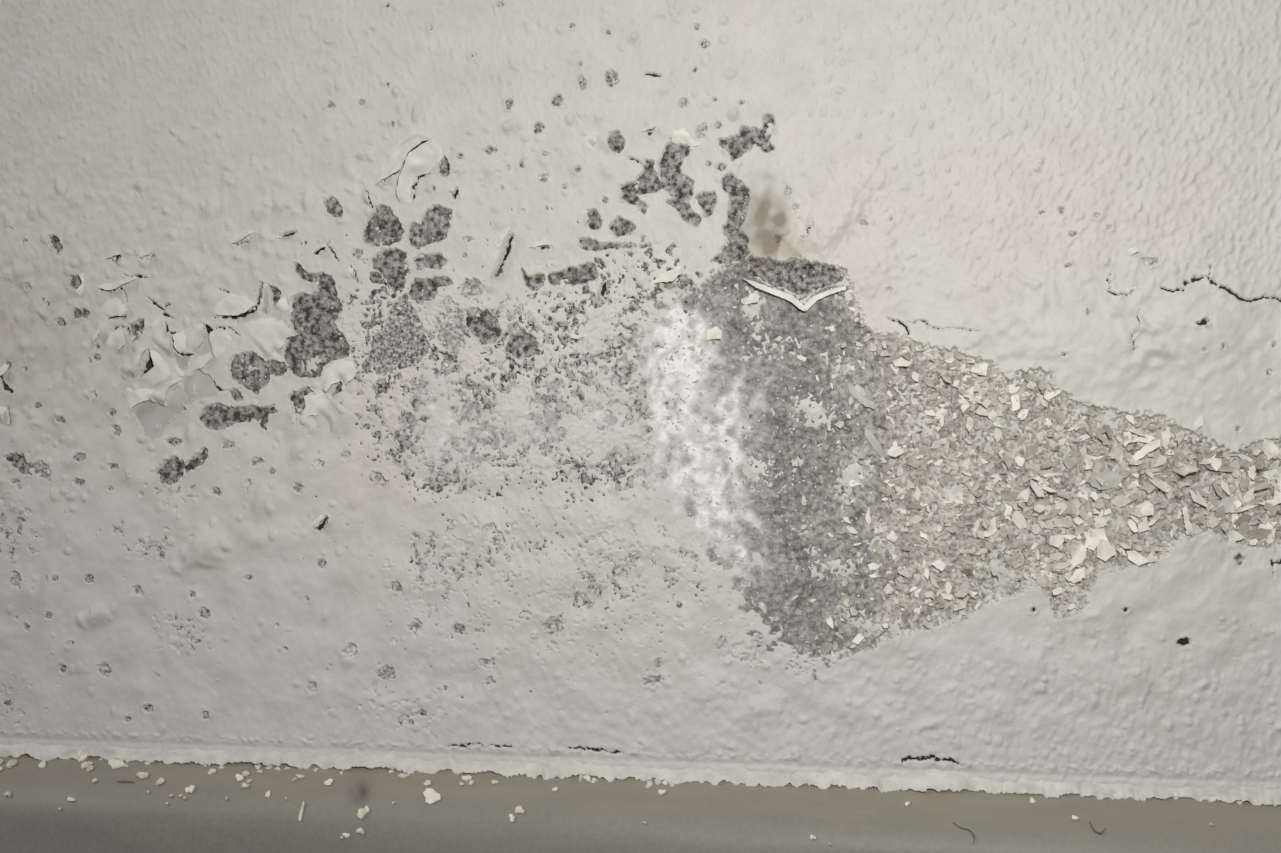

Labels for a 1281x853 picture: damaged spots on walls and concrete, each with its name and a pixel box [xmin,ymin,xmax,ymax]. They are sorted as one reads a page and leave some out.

crack [1106,266,1281,350]
spalling [58,115,1281,687]
spalling [0,498,41,588]